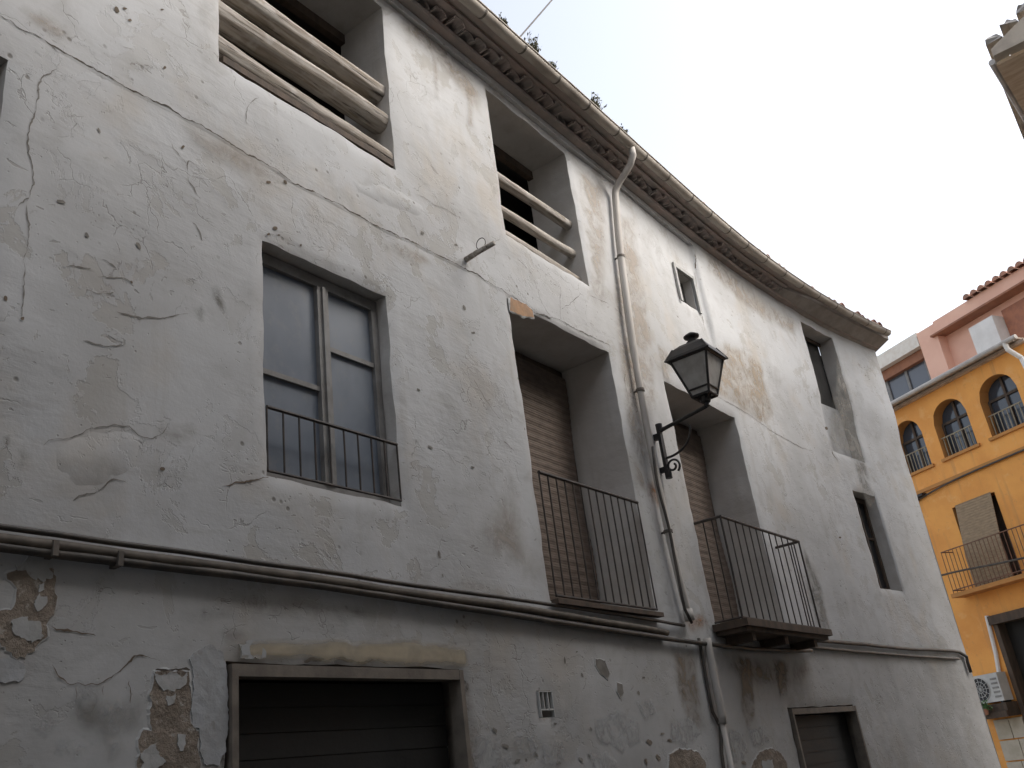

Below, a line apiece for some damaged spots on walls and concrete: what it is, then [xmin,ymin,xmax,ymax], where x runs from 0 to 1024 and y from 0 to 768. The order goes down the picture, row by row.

crack [0,15,625,345]
flaking render [508,297,535,319]
crack [44,424,168,445]
crack [73,478,125,501]
flaking render [0,556,58,660]
crack [53,654,160,701]
flaking render [594,658,624,699]
flaking render [135,667,202,768]
flaking render [644,733,706,768]
flaking render [732,747,788,768]